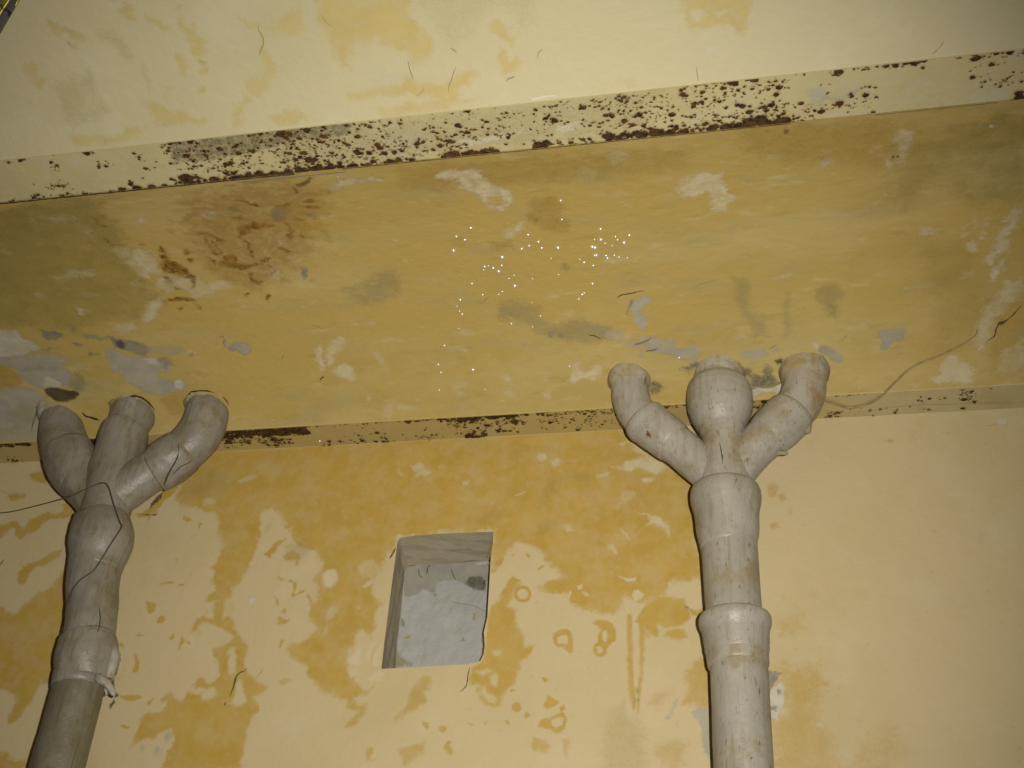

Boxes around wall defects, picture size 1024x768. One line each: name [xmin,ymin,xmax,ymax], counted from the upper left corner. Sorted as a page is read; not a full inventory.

corrosion [955,50,1024,100]
corrosion [8,155,91,202]
corrosion [109,60,928,252]
flaking render [29,214,234,396]
corrosion [159,246,202,311]
flaking render [43,376,80,403]
corrosion [222,409,620,448]
corrosion [825,389,977,418]
peeling [108,430,705,768]
peeling [680,656,713,761]